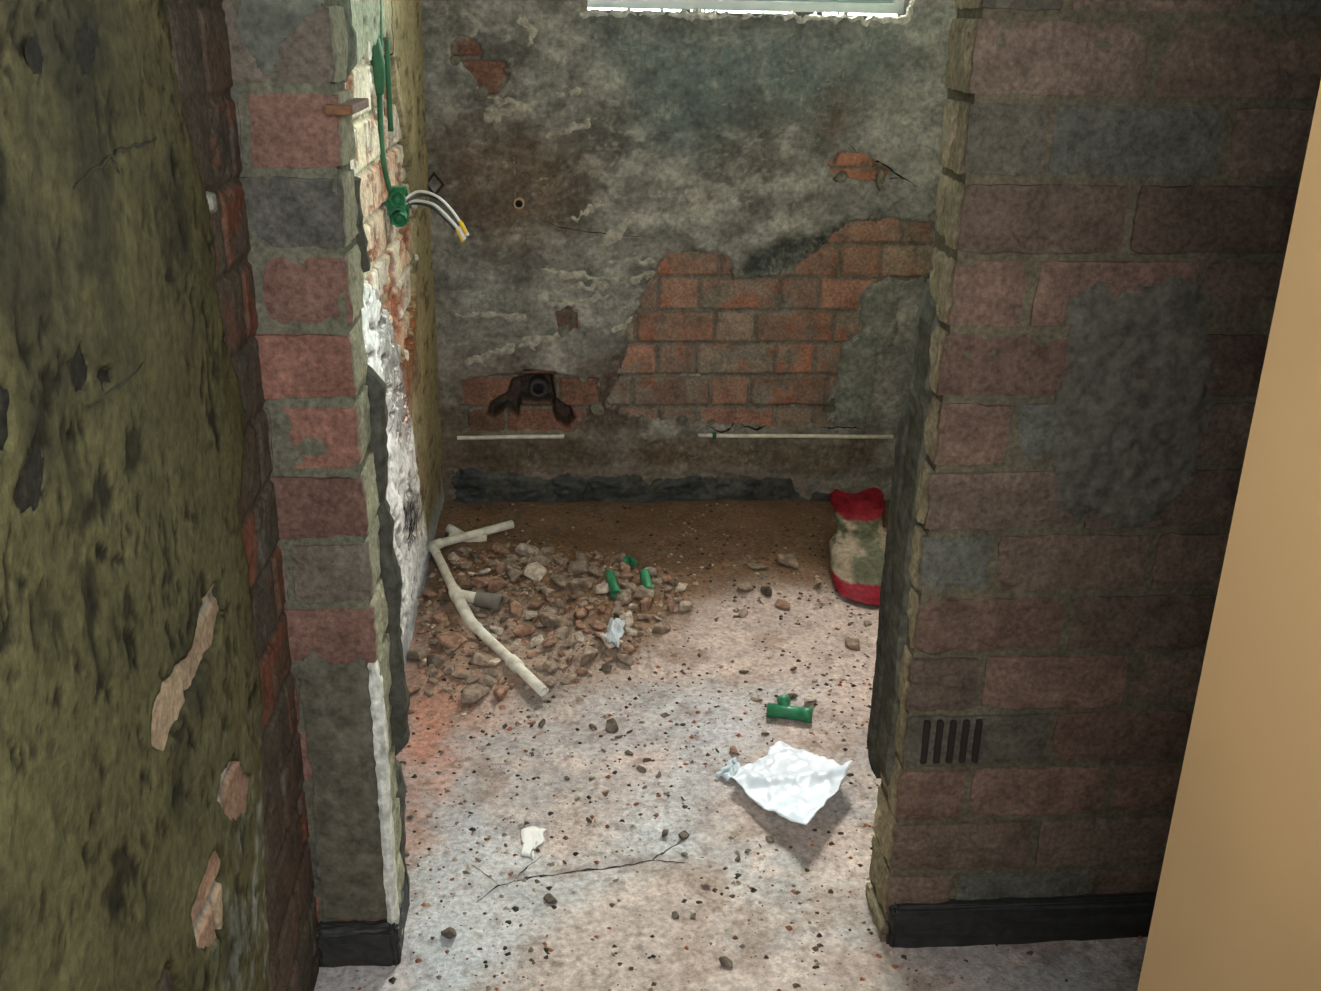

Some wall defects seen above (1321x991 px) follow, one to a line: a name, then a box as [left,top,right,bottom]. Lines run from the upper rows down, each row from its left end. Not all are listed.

flaking render [449,36,513,102]
flaking render [338,0,419,361]
flaking render [828,152,890,191]
water stain [379,310,407,436]
flaking render [164,0,319,991]
water stain [403,490,419,544]
flaking render [458,214,941,787]
flaking render [151,583,219,751]